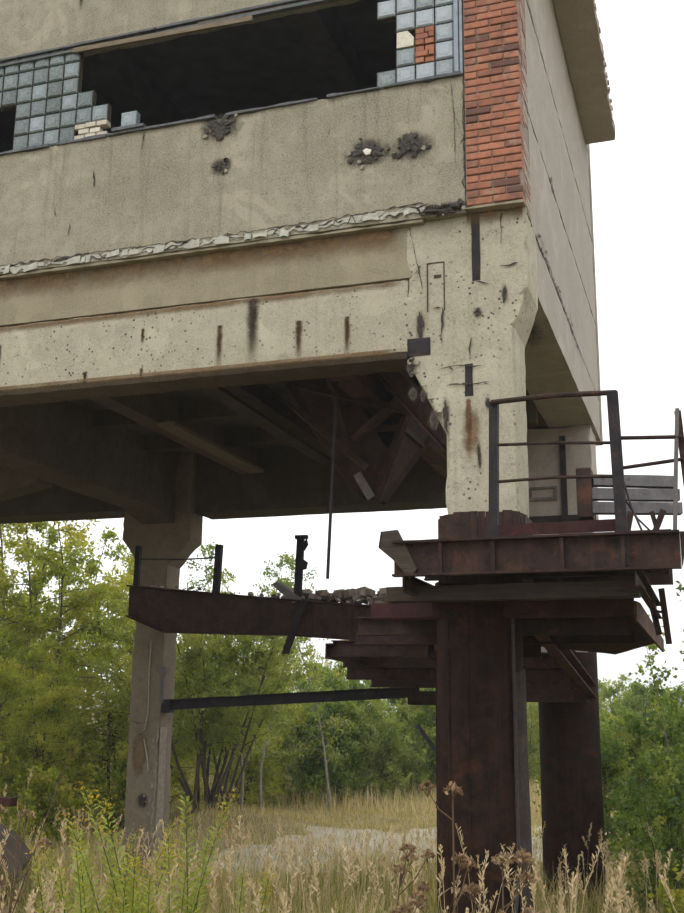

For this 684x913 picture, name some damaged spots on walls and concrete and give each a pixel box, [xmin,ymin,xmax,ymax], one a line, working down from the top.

spalling [202,113,238,142]
spalling [212,158,229,174]
spalling [347,131,432,170]
peeling [0,198,466,274]